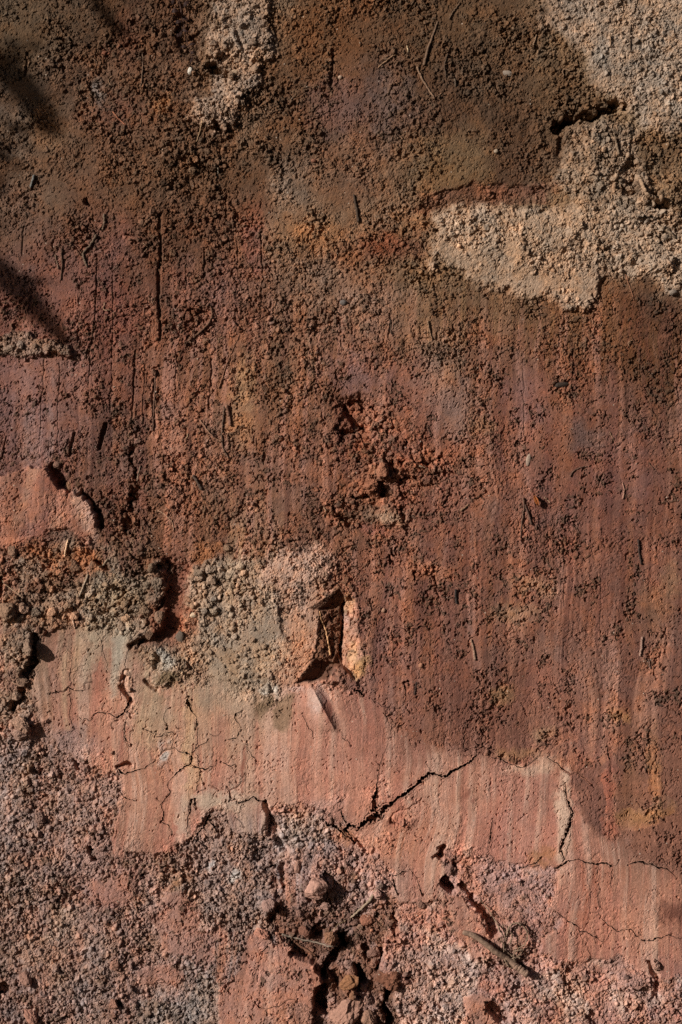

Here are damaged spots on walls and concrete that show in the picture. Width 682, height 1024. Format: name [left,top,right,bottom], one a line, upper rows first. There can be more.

spalling [0,531,275,1024]
crack [50,681,265,849]
crack [324,721,682,959]